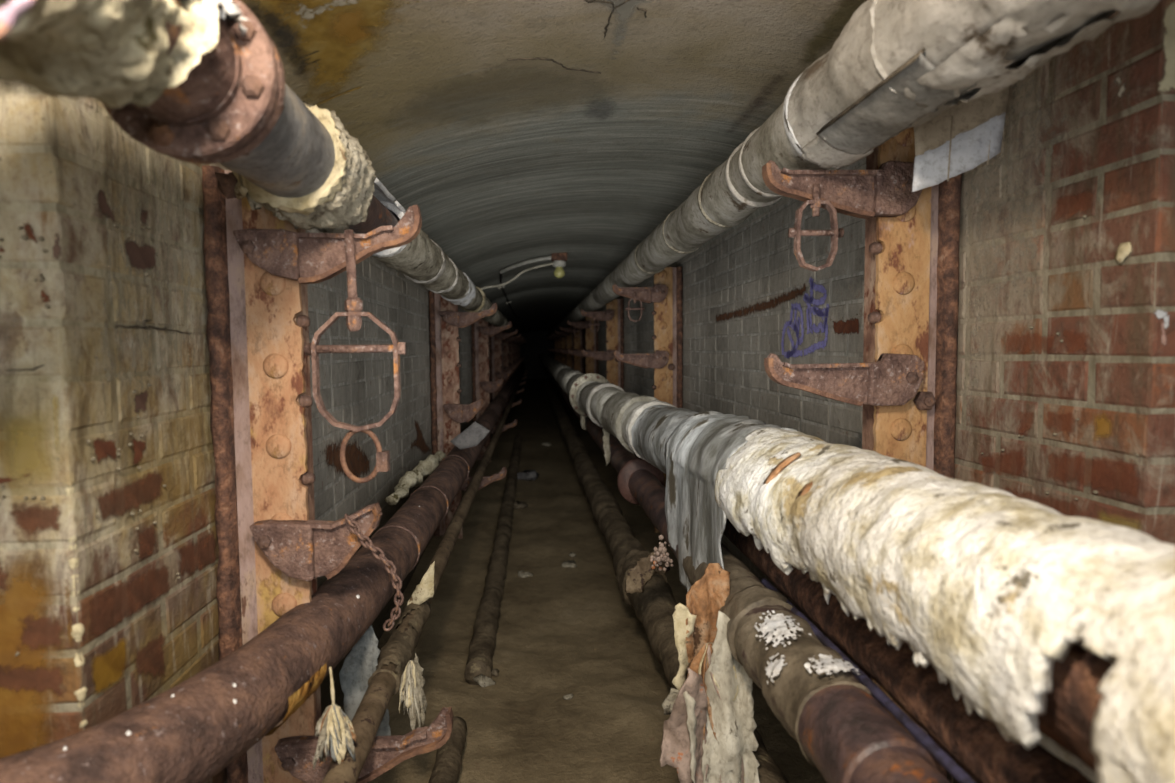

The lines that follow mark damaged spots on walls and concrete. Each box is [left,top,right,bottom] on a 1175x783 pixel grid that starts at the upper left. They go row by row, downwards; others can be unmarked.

water stain [250,0,392,105]
crack [508,57,601,74]
crack [584,0,647,37]
flaking render [1158,2,1175,91]
peeling [93,190,160,277]
peeling [0,474,61,534]
peeling [86,432,216,635]
water stain [68,536,85,667]
peeling [0,616,66,695]
peeling [135,633,165,677]
water stain [74,687,88,727]
rust [265,664,327,736]